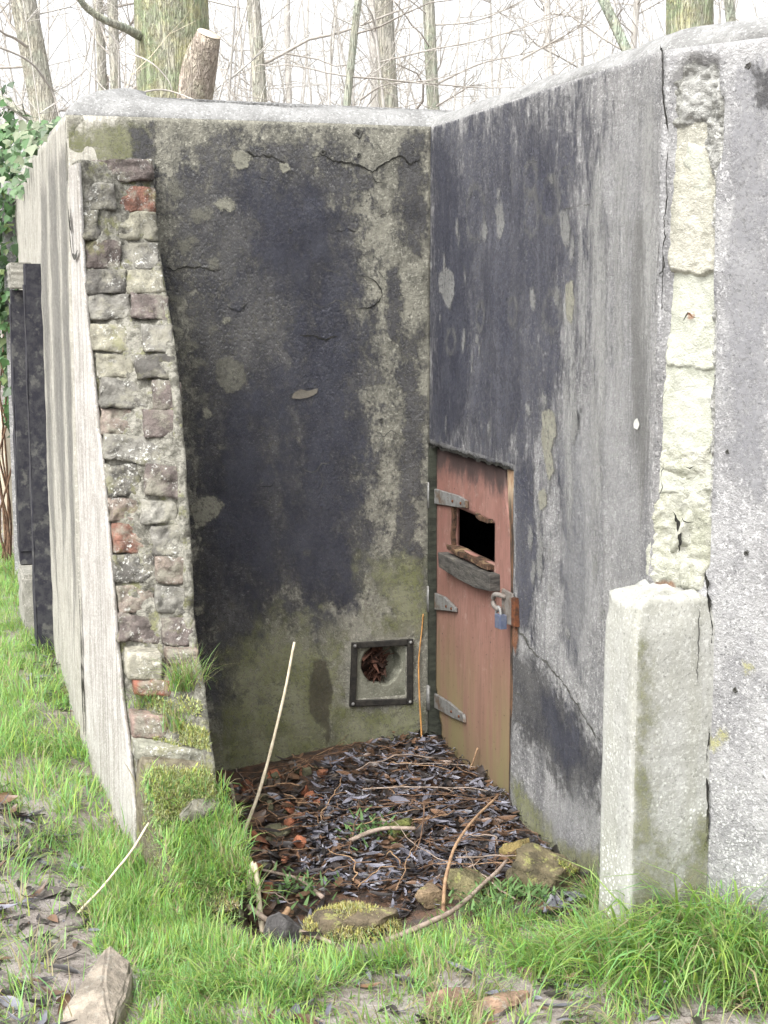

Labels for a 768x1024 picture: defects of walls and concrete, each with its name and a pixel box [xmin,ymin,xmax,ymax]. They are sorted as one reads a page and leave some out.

crack [246,145,420,183]
damp [638,102,658,336]
crack [659,45,695,321]
damp [154,79,626,728]
spalling [646,60,729,591]
damp [310,659,333,746]
crack [516,629,598,742]
damp [512,647,603,839]
crack [696,570,713,680]
crack [704,733,712,843]